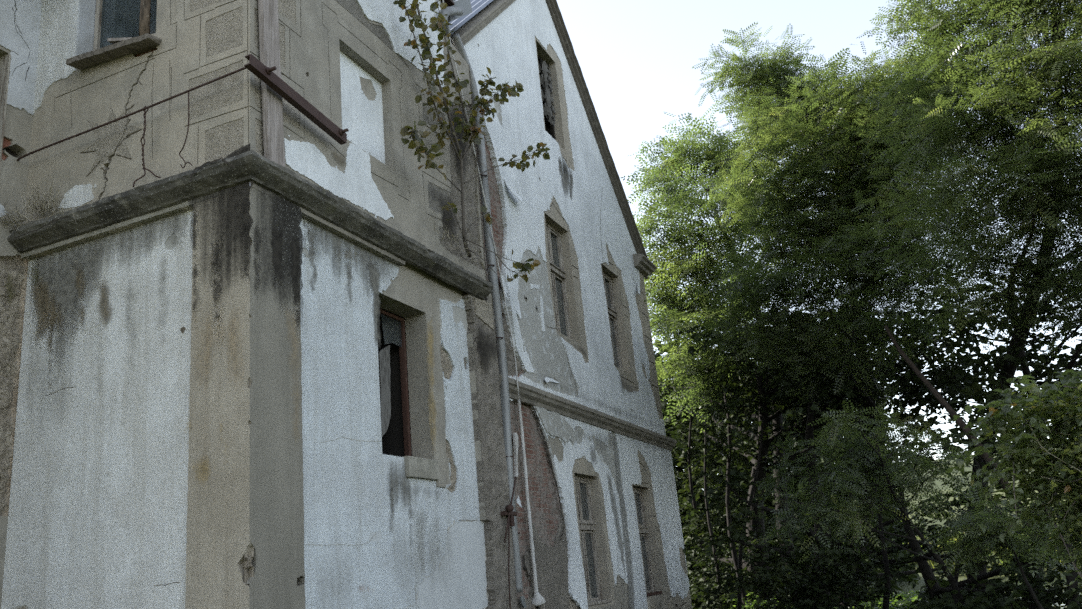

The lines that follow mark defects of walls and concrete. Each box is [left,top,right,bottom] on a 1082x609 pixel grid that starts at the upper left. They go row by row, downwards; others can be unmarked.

water stain [34,214,196,353]
water stain [244,224,386,341]
peeling [378,263,468,493]
peeling [441,105,589,397]
flaking render [510,400,630,609]
peeling [632,451,692,609]